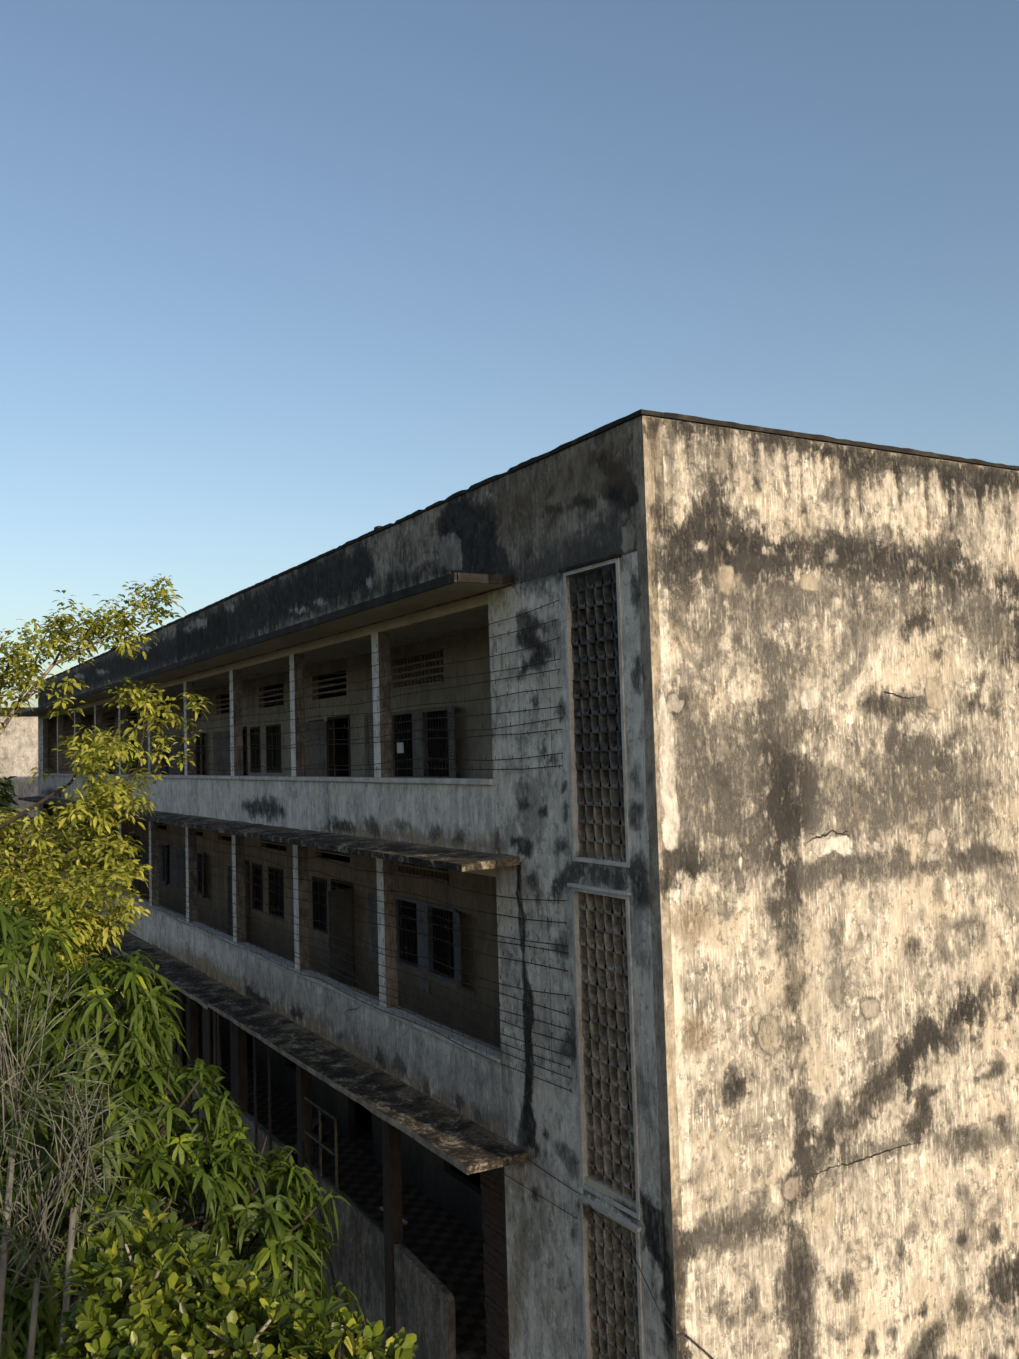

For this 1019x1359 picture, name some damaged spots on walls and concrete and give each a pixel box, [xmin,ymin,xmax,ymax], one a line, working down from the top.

leakage [643,418,1019,514]
leakage [39,451,1019,1173]
leakage [577,974,1019,1359]
crack [808,1142,923,1178]